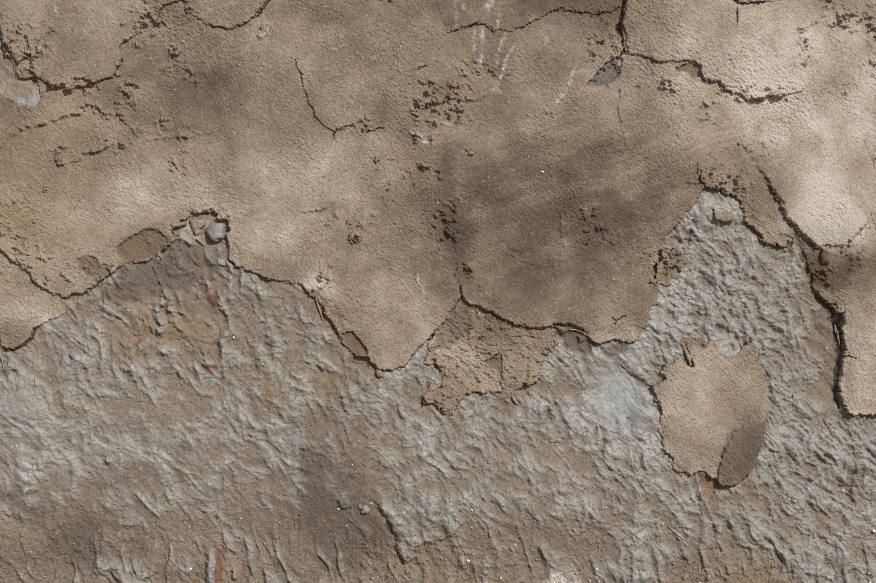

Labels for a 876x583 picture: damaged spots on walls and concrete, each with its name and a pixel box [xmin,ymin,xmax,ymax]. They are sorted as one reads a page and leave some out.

crack [615,0,627,57]
crack [295,59,385,143]
spalling [78,255,116,279]
spalling [116,219,206,260]
spalling [341,332,368,357]
crack [814,295,857,408]